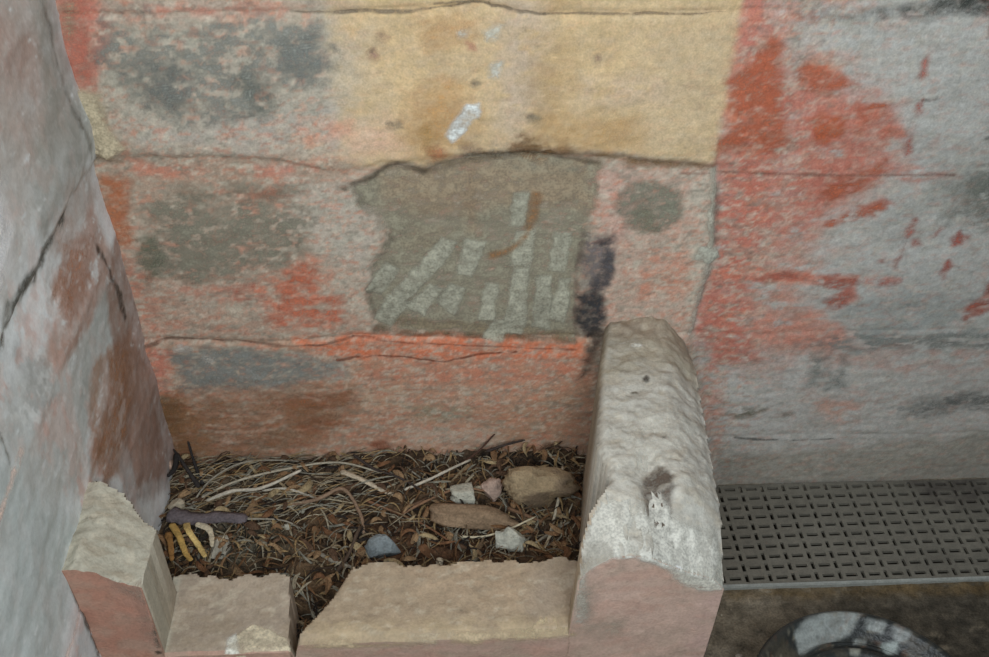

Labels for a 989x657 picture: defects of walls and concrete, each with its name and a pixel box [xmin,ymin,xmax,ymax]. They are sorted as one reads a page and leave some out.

crack [297,0,702,15]
crack [0,211,65,345]
crack [97,246,126,319]
flaking render [342,151,601,342]
crack [144,337,272,347]
crack [313,335,517,361]